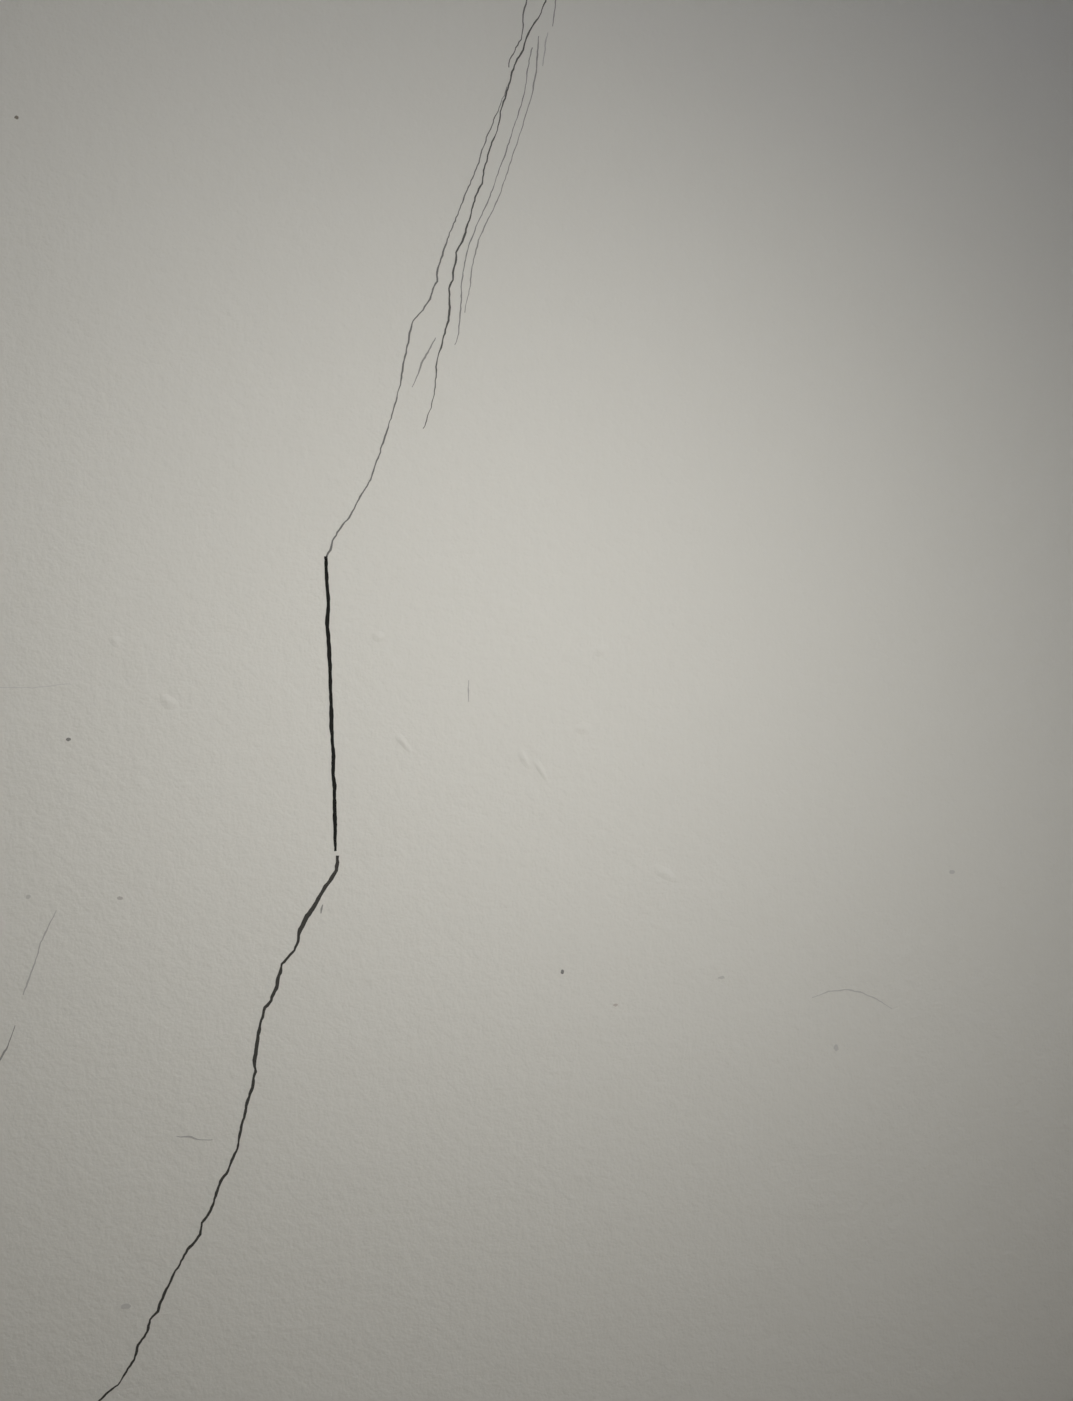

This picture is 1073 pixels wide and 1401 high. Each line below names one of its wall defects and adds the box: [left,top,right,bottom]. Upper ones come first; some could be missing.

crack [98,0,556,1401]